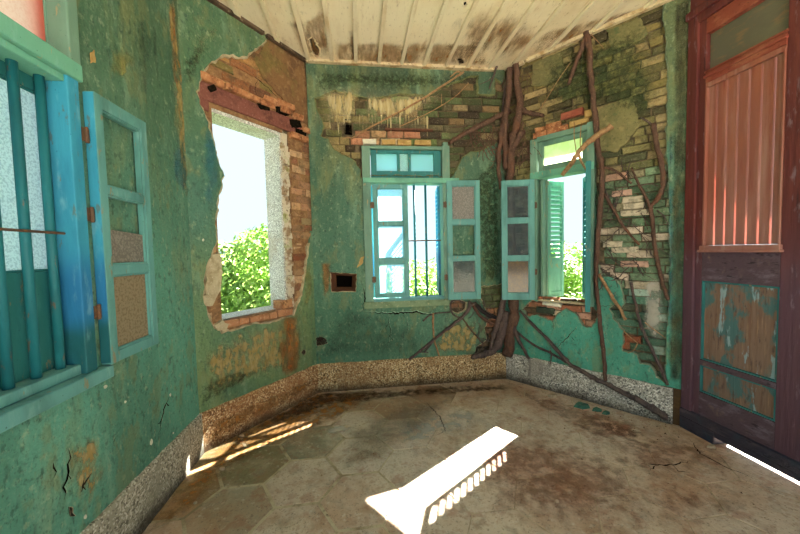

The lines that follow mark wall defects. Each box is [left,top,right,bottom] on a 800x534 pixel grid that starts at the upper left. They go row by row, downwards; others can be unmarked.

leakage [294,20,325,50]
leakage [339,25,529,64]
flaking render [196,5,672,383]
crack [363,288,436,348]
crack [53,448,91,498]